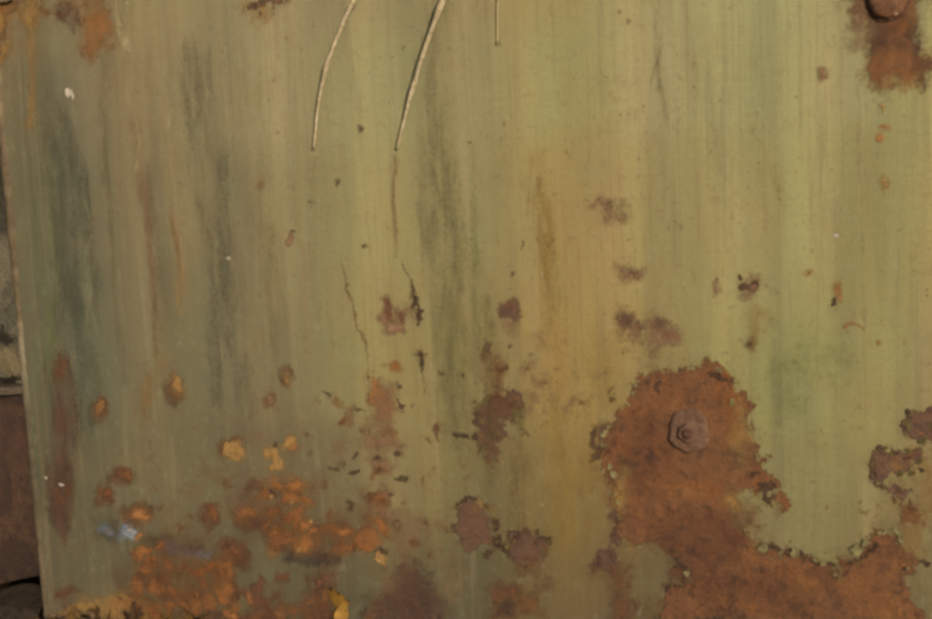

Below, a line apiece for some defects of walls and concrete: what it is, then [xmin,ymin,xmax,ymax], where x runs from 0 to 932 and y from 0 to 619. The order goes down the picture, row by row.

corrosion [849,0,932,89]
corrosion [95,467,162,526]
corrosion [218,437,246,462]
corrosion [245,433,401,558]
corrosion [328,361,408,482]
corrosion [452,386,535,466]
corrosion [446,495,552,569]
corrosion [589,356,932,619]
corrosion [49,540,253,619]